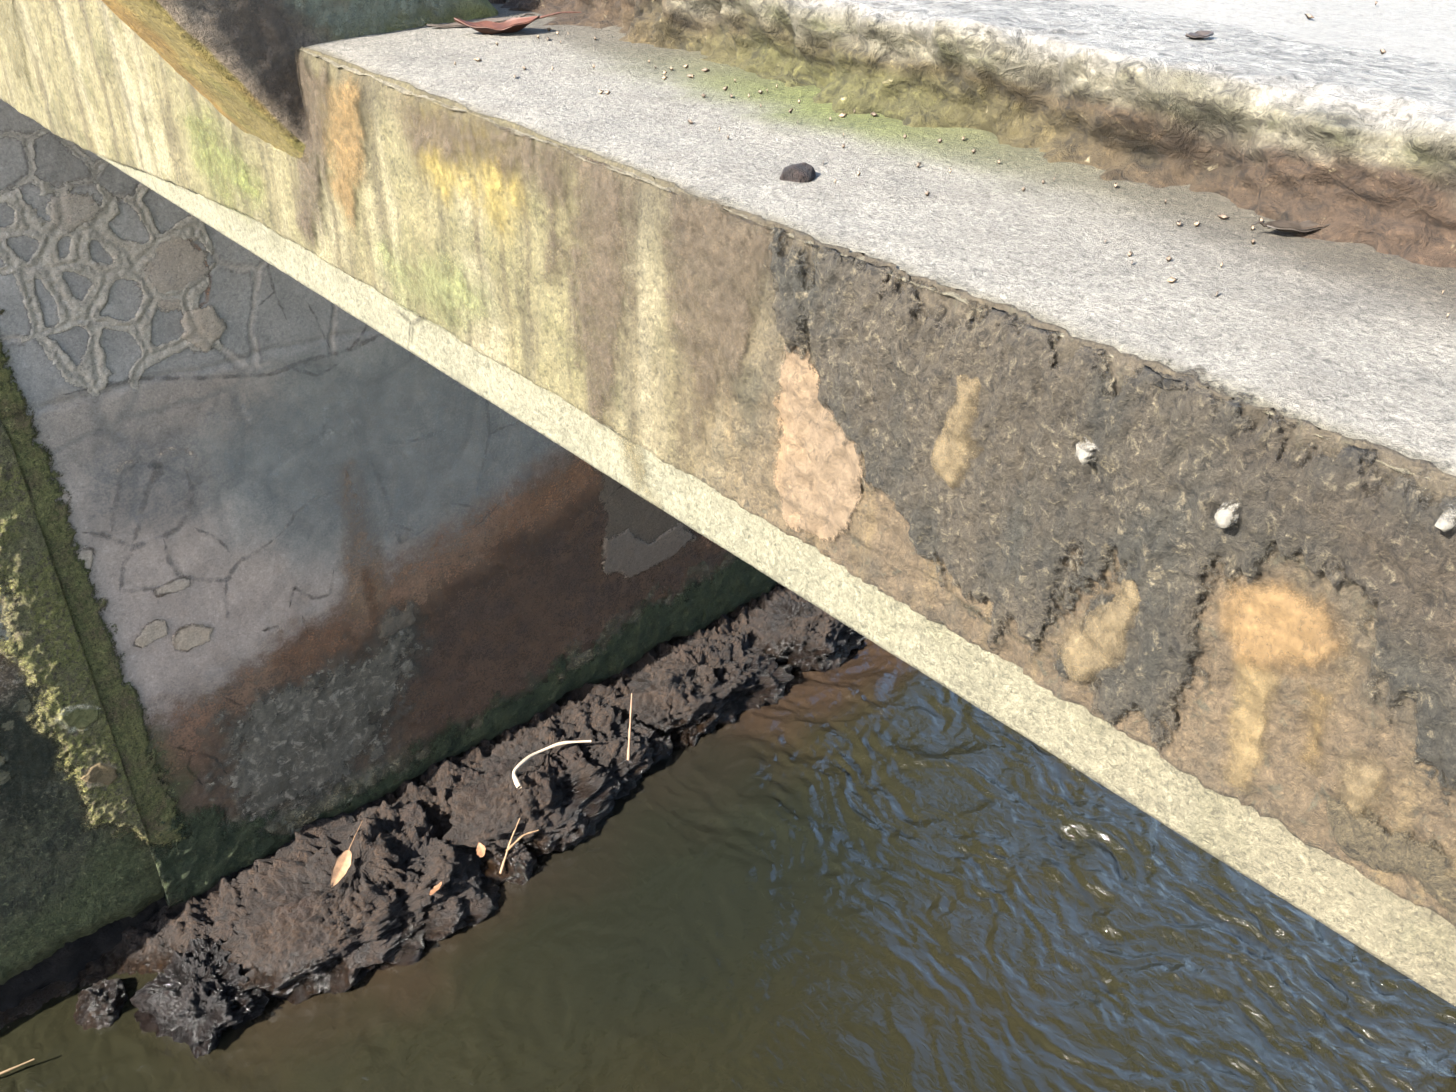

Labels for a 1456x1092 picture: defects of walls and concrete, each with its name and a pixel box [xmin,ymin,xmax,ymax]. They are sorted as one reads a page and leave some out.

crack [65,313,423,395]
peeling [772,345,863,542]
crack [86,462,239,615]
peeling [589,464,697,578]
rust [700,535,714,551]
leakage [0,582,16,641]
rust [147,455,603,784]
leakage [261,498,738,837]
leakage [0,683,61,815]